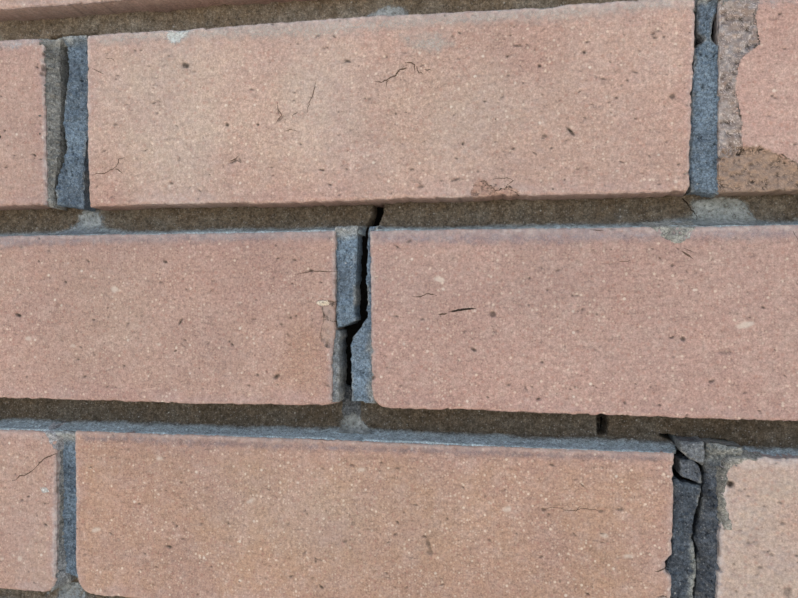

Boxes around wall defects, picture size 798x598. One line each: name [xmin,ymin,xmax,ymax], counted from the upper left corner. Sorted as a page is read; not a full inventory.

spalling [718,0,798,192]
crack [319,207,384,386]
crack [681,454,702,484]